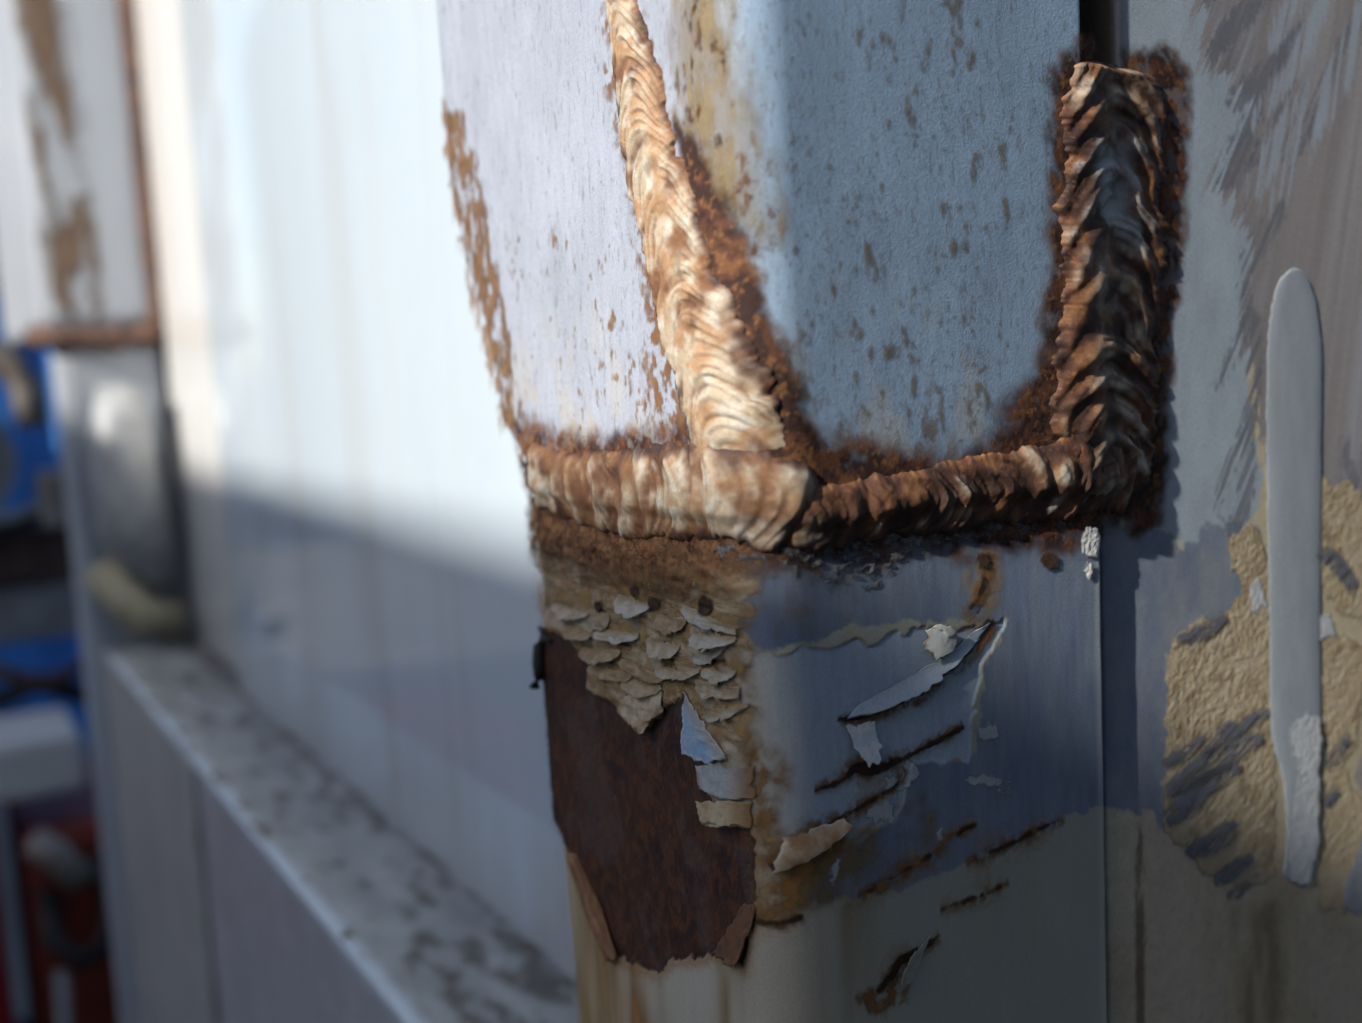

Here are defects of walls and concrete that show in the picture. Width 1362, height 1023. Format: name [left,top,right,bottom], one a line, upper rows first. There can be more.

rust [442,0,1190,601]
rust [538,626,843,973]
peeling [533,521,1035,756]
peeling [864,760,920,826]
spalling [1040,552,1058,569]
peeling [1057,513,1100,579]
peeling [1162,476,1362,915]
rust [857,981,909,1013]